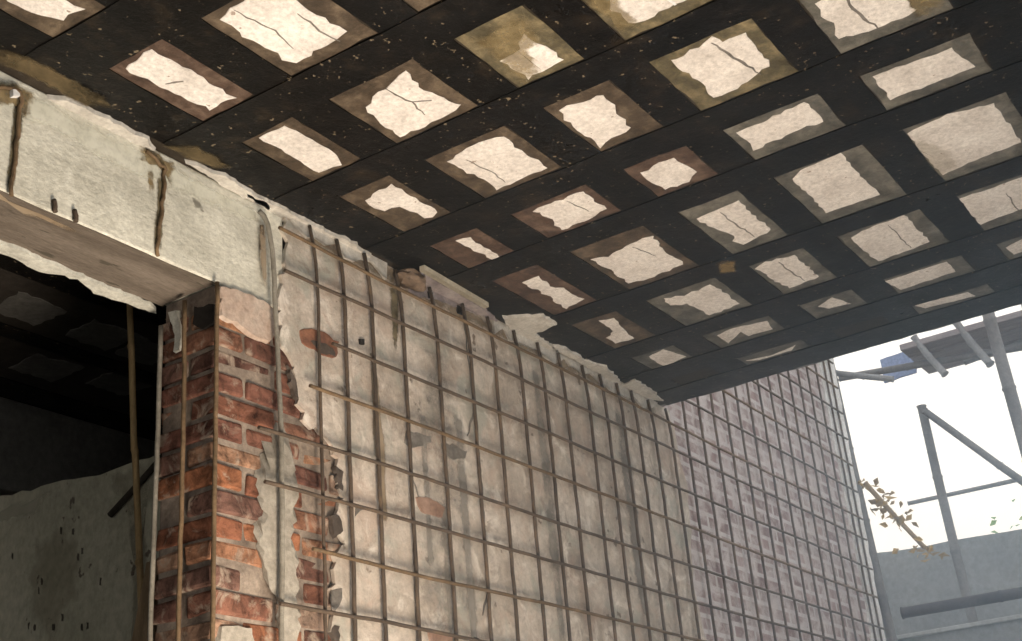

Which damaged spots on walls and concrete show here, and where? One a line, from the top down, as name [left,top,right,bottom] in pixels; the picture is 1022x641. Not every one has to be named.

crack [234,10,294,49]
crack [297,13,340,42]
crack [847,0,878,29]
crack [711,43,761,75]
crack [386,89,432,115]
rust [0,83,32,197]
peeling [624,146,718,197]
rust [141,148,174,257]
spalling [184,159,885,641]
spalling [147,325,164,641]
spalling [176,281,220,641]